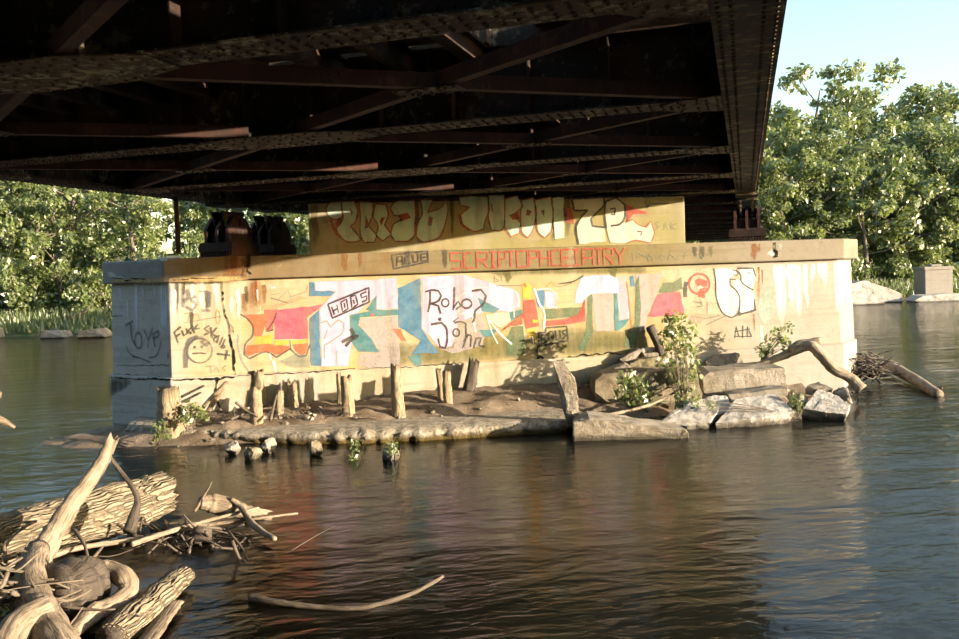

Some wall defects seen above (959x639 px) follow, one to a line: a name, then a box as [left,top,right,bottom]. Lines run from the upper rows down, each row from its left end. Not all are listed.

crack [110,254,453,411]
damp [773,262,848,315]